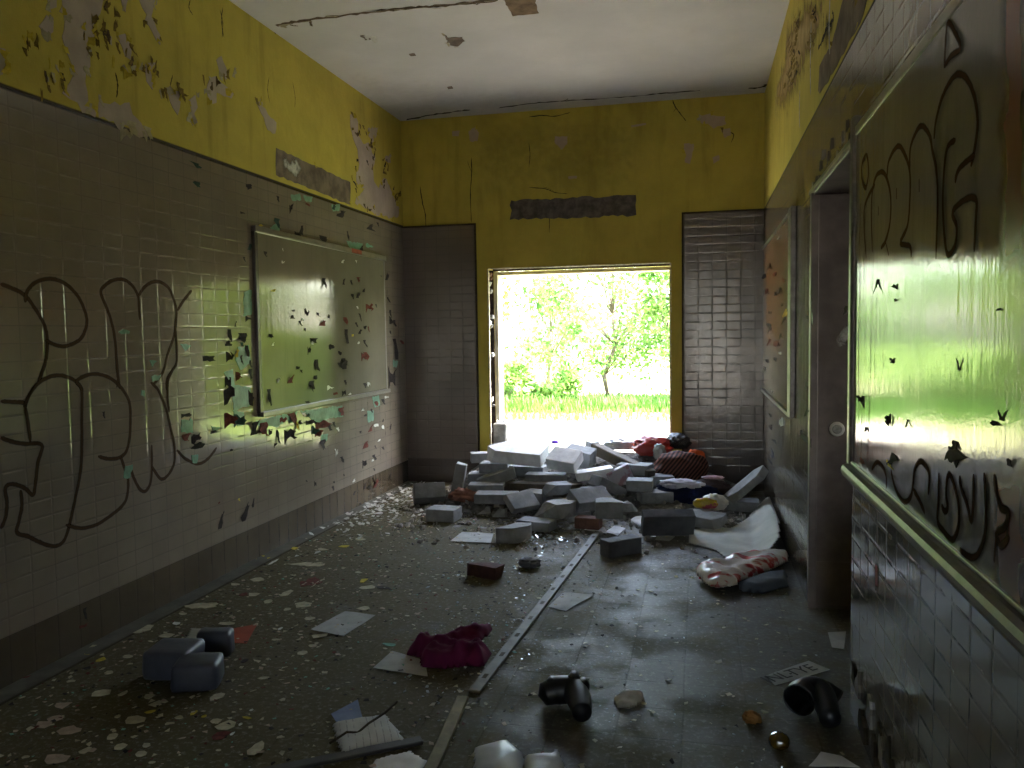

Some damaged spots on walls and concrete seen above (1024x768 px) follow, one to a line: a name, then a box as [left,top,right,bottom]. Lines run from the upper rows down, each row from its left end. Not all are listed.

crack [274,0,498,34]
peeling [504,0,539,16]
peeling [441,33,464,48]
peeling [22,0,237,142]
crack [500,90,700,121]
peeling [259,112,401,232]
peeling [510,195,636,220]
peeling [181,277,404,495]